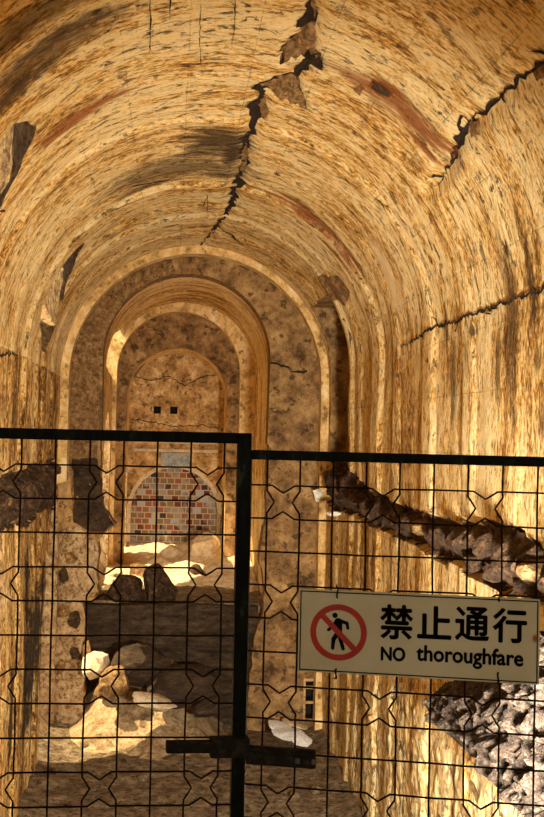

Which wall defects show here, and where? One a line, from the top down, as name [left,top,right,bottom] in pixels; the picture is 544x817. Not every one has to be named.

crack [200,0,324,246]
spalling [254,20,323,109]
crack [428,50,544,189]
spalling [69,259,175,430]
spalling [317,274,350,306]
crack [402,285,544,346]
peeling [0,440,115,724]
spalling [322,461,544,602]
peeling [345,633,544,817]